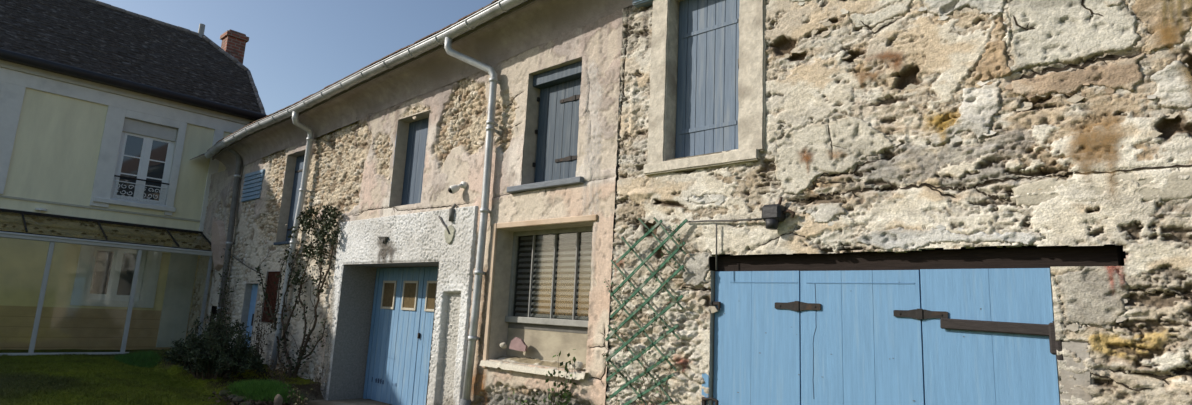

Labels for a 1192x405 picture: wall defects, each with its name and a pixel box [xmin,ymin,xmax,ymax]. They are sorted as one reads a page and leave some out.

crack [1081,0,1103,22]
flaking render [303,120,394,222]
flaking render [398,77,519,171]
crack [585,16,630,205]
corrosion [929,114,957,139]
flaking render [820,0,1192,147]
corrosion [1070,118,1116,170]